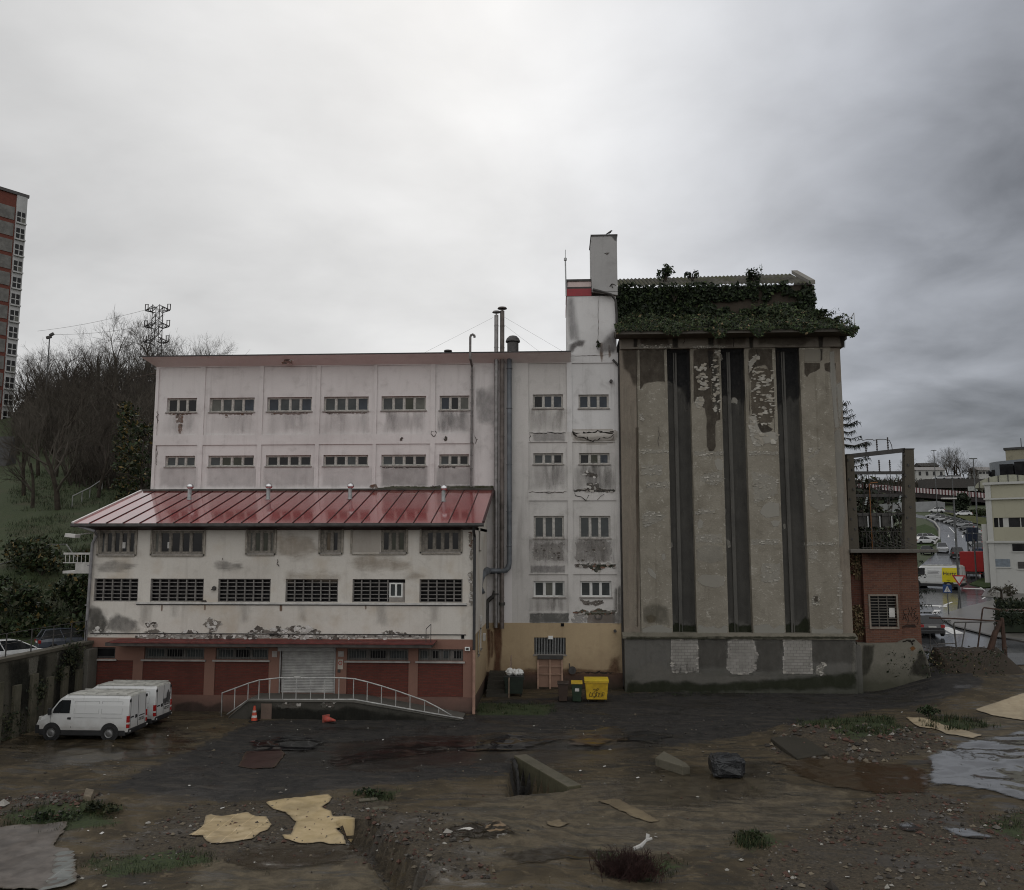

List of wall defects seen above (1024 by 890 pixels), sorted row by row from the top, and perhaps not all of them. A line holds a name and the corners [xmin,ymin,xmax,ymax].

water stain [569,300,584,351]
flaking render [693,345,725,412]
flaking render [748,355,779,456]
spalling [574,470,615,493]
spalling [575,542,617,573]
water stain [89,608,135,633]
peeling [135,617,429,640]
spalling [571,599,616,623]
flaking render [634,639,768,684]